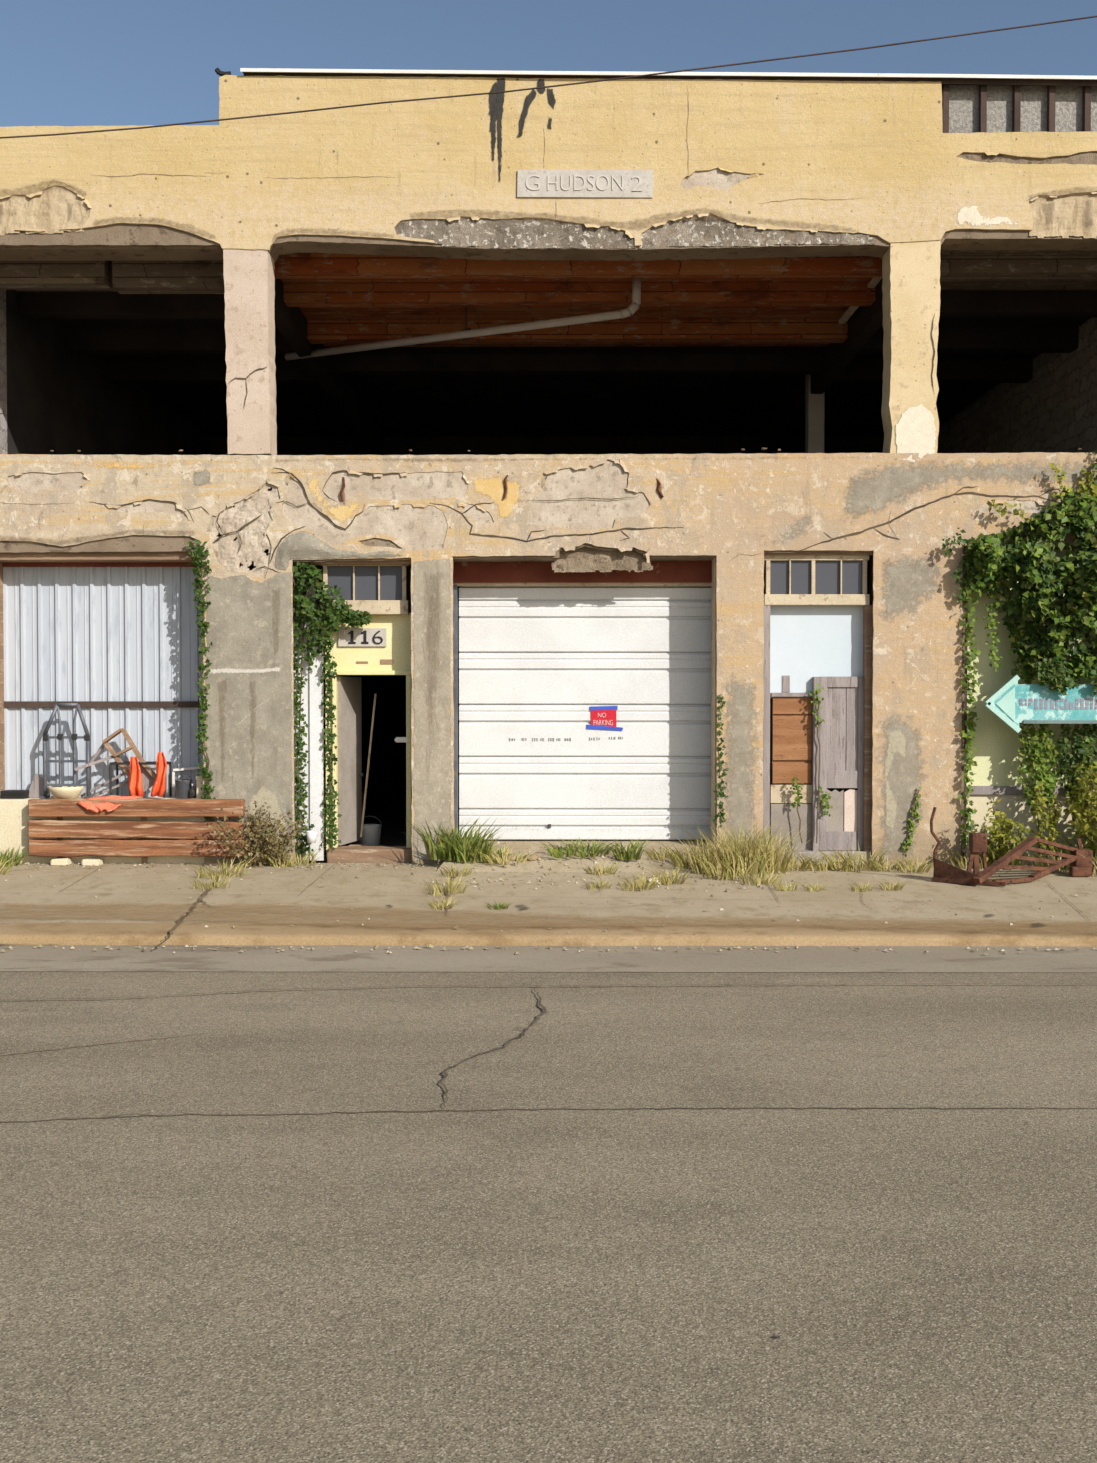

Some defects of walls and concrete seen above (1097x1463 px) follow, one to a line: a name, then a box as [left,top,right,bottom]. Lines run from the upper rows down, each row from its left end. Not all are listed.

leakage [496,78,506,181]
peeling [680,168,763,191]
spalling [957,152,1097,165]
peeling [0,186,92,236]
spalling [395,213,876,249]
peeling [1029,192,1097,238]
peeling [104,470,494,579]
peeling [527,458,653,573]
crack [796,486,1063,552]